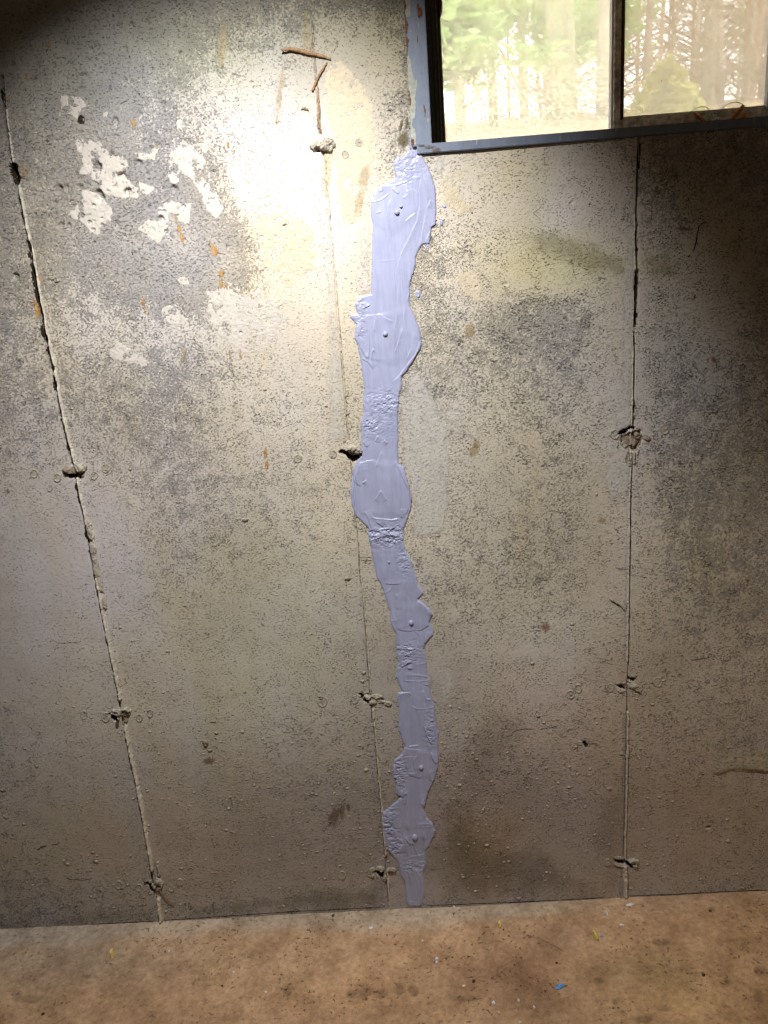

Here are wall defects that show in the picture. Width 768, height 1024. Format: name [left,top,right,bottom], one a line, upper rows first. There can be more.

peeling [60,95,86,124]
peeling [68,137,321,286]